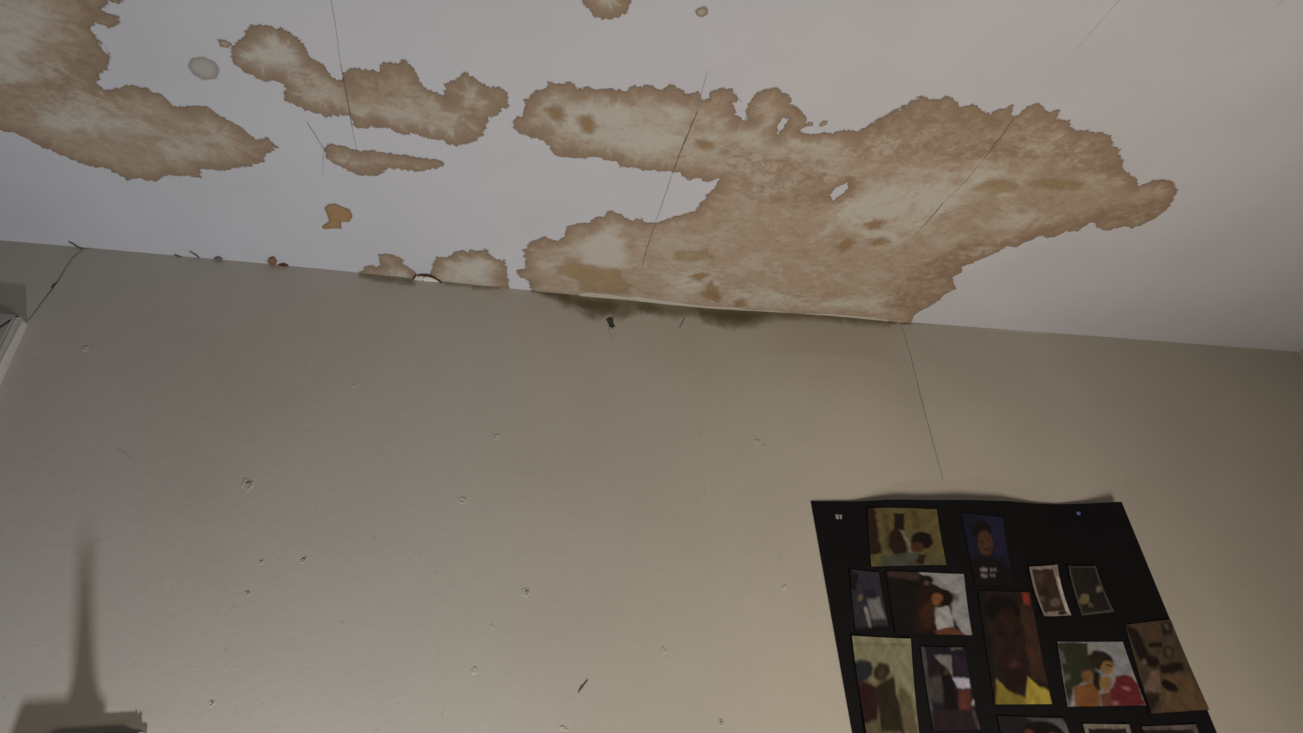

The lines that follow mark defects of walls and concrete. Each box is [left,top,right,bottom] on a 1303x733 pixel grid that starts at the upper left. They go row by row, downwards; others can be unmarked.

water stain [0,0,279,182]
water stain [583,0,631,20]
water stain [218,24,1178,326]
crack [30,248,88,318]